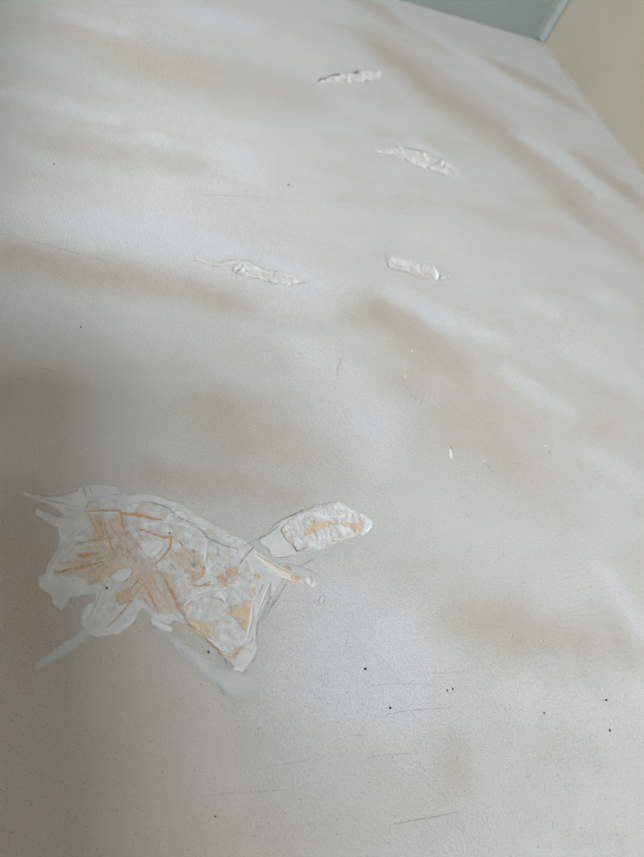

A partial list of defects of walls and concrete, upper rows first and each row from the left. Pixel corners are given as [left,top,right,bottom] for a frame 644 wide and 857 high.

flaking render [319,70,381,83]
flaking render [373,147,459,176]
flaking render [23,484,373,702]